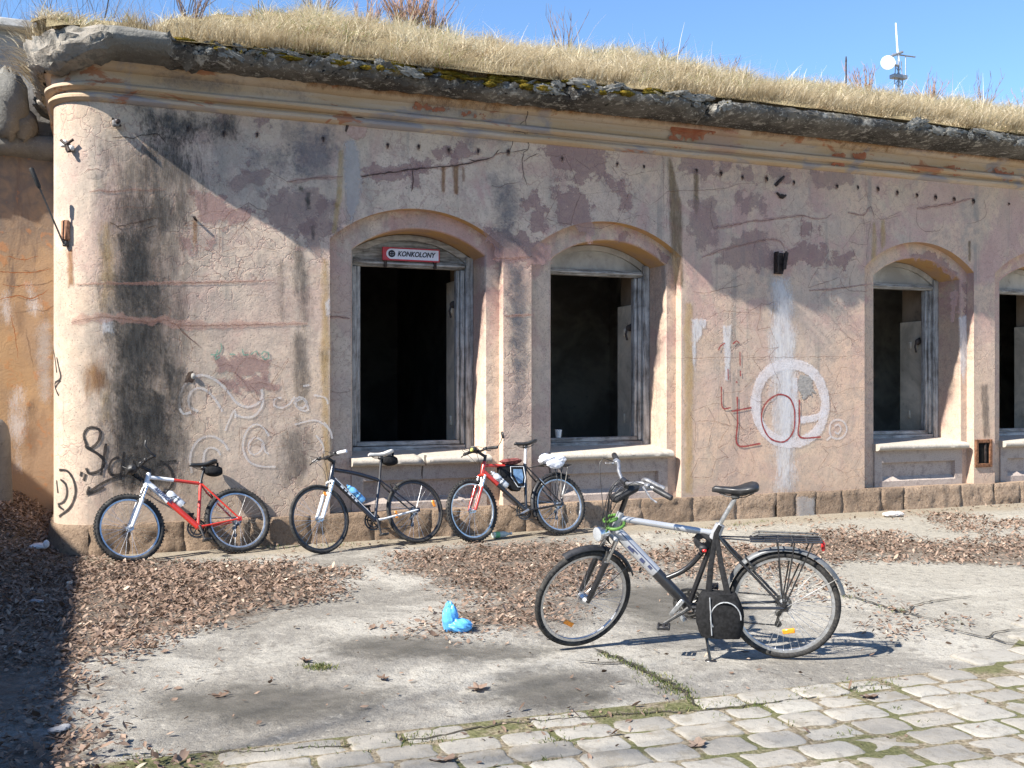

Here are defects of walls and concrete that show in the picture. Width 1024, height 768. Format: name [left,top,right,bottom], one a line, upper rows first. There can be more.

crack [268,111,539,191]
corrosion [442,167,458,194]
peeling [484,144,632,266]
peeling [668,127,716,149]
peeling [781,217,855,271]
leakage [103,107,236,486]